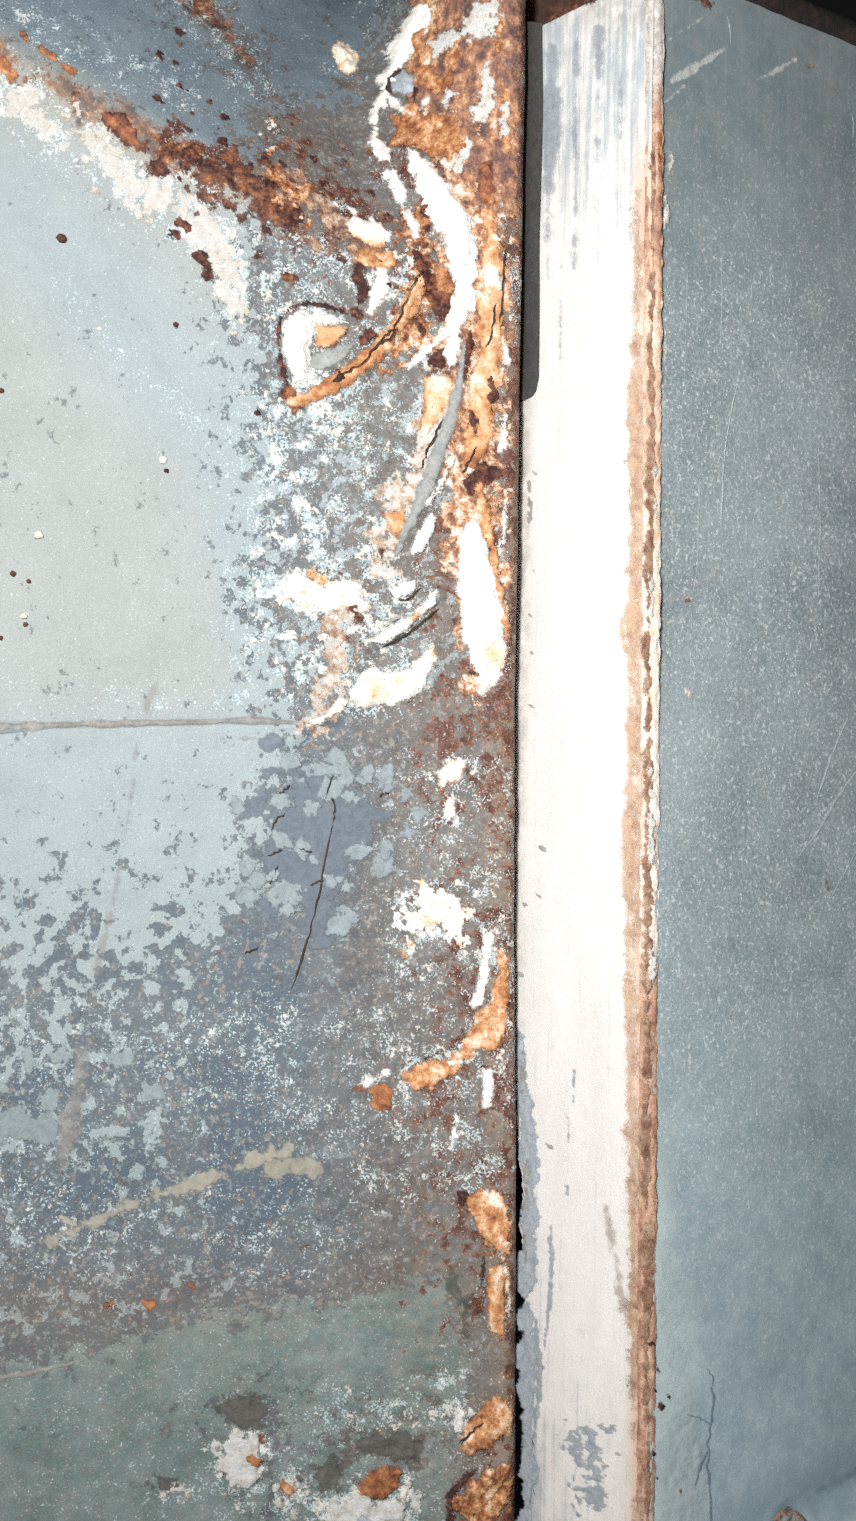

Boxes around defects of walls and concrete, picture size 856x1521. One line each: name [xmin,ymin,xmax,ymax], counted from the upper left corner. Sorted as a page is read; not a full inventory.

rust [0,54,19,84]
rust [101,0,524,745]
peeling [278,482,511,729]
crack [291,796,336,989]
peeling [228,744,469,955]
peeling [392,878,495,1009]
rust [619,116,672,1521]
rust [352,949,511,1111]
peeling [482,1068,494,1109]
rust [456,1188,515,1336]
spalling [207,1395,430,1521]
rust [445,1396,514,1521]